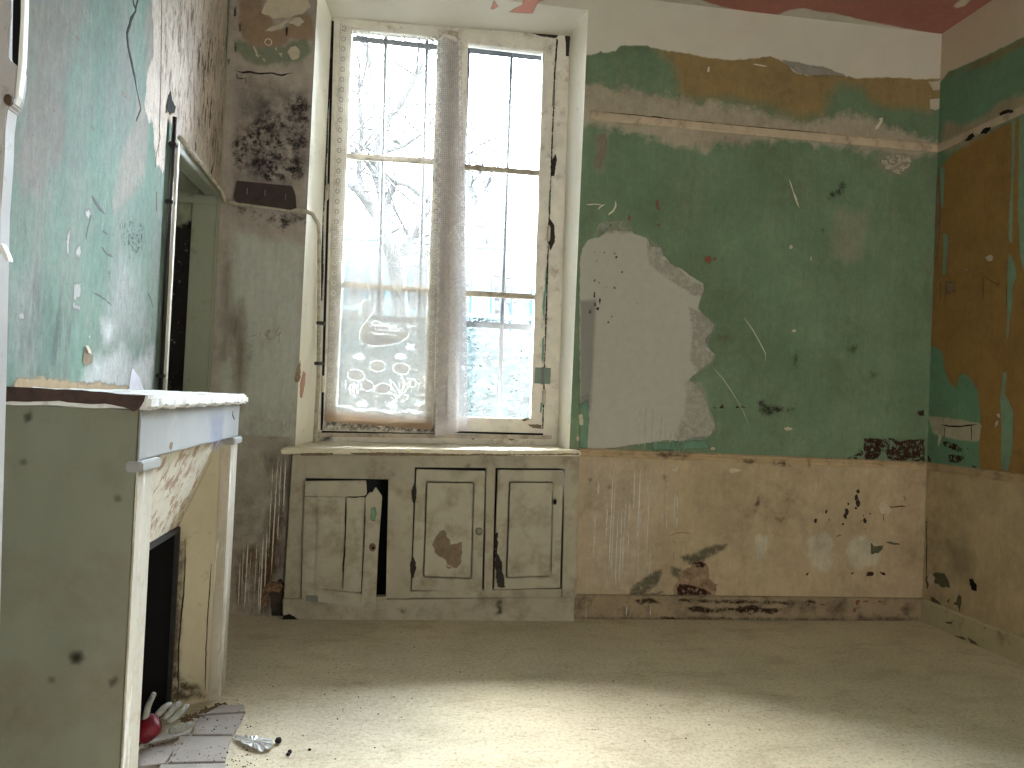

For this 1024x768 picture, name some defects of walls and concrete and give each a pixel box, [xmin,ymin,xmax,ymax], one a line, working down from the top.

peeling [253,0,311,62]
crack [126,0,162,157]
spalling [166,91,177,115]
peeling [783,60,845,77]
peeling [928,80,940,111]
leakage [235,99,308,180]
peeling [83,336,93,365]
peeling [847,438,931,462]
peeling [814,489,892,537]
peeling [432,530,462,569]
peeling [871,542,900,554]
spalling [672,560,789,615]